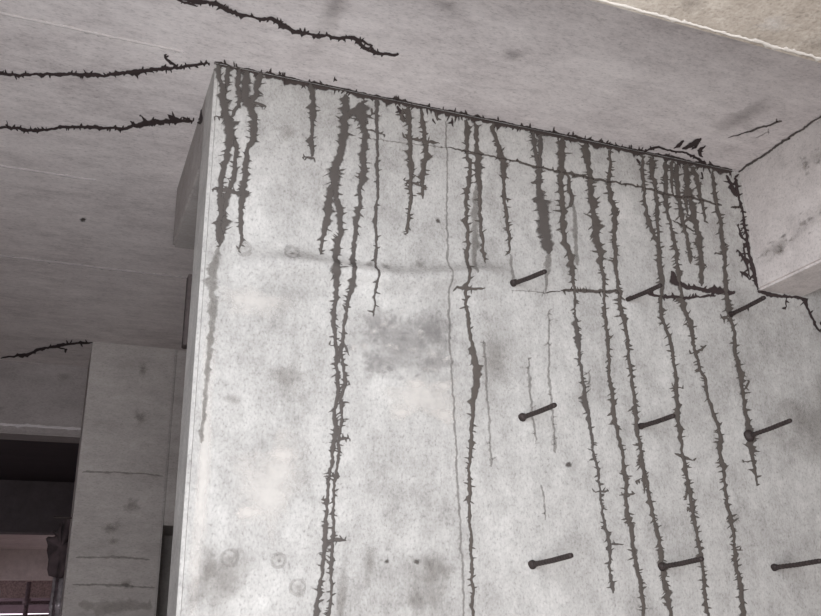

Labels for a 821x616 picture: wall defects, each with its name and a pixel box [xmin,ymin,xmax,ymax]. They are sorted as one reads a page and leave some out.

crack [177,0,399,57]
crack [0,54,821,209]
crack [546,287,625,300]
crack [645,271,735,301]
crack [747,290,821,332]
crack [1,339,93,359]